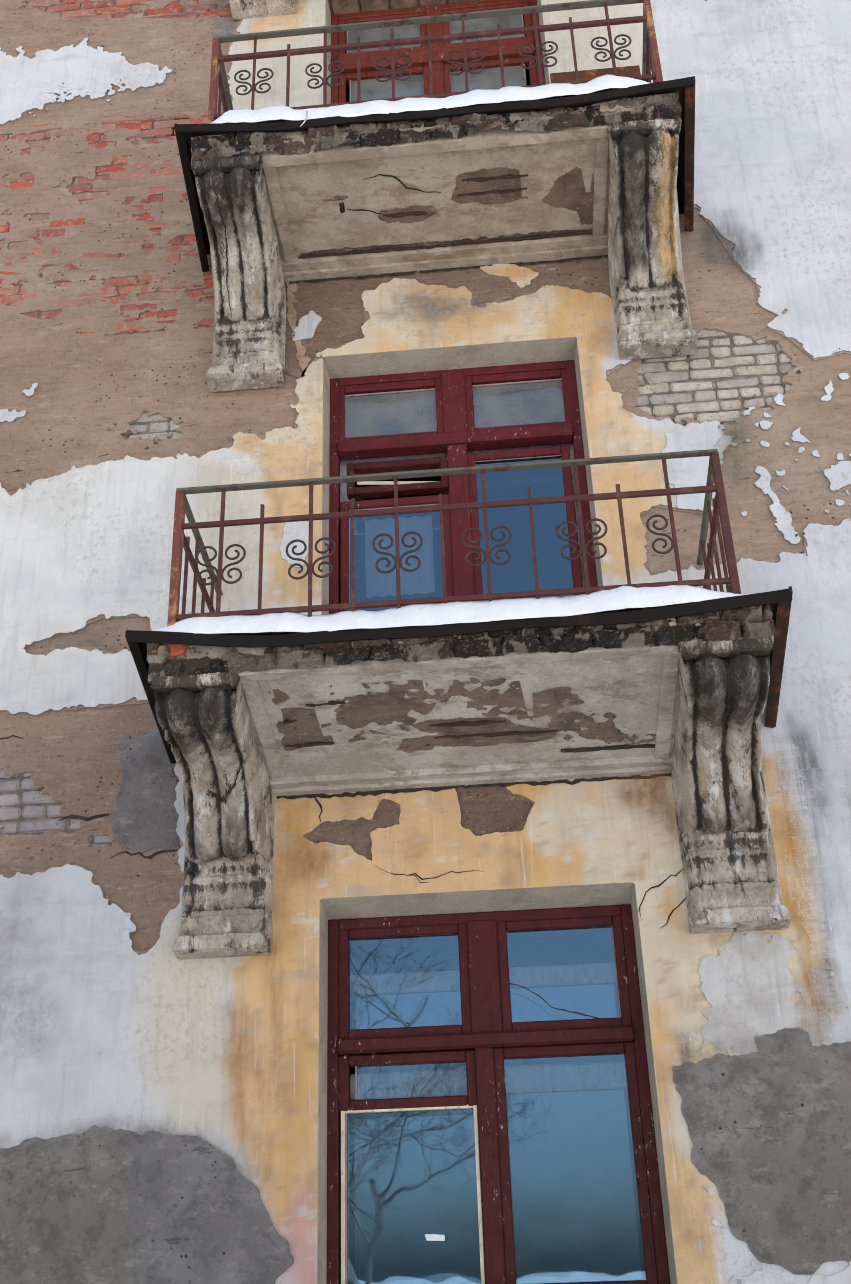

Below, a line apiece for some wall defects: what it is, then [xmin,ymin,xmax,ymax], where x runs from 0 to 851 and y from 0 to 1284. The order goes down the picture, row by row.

crack [322,174,441,214]
peeling [0,0,681,496]
peeling [606,204,851,576]
peeling [280,521,309,568]
spalling [25,604,775,677]
spalling [269,677,656,753]
peeling [0,698,184,955]
peeling [303,799,401,861]
peeling [455,785,535,836]
crack [376,866,477,883]
crack [639,869,686,929]